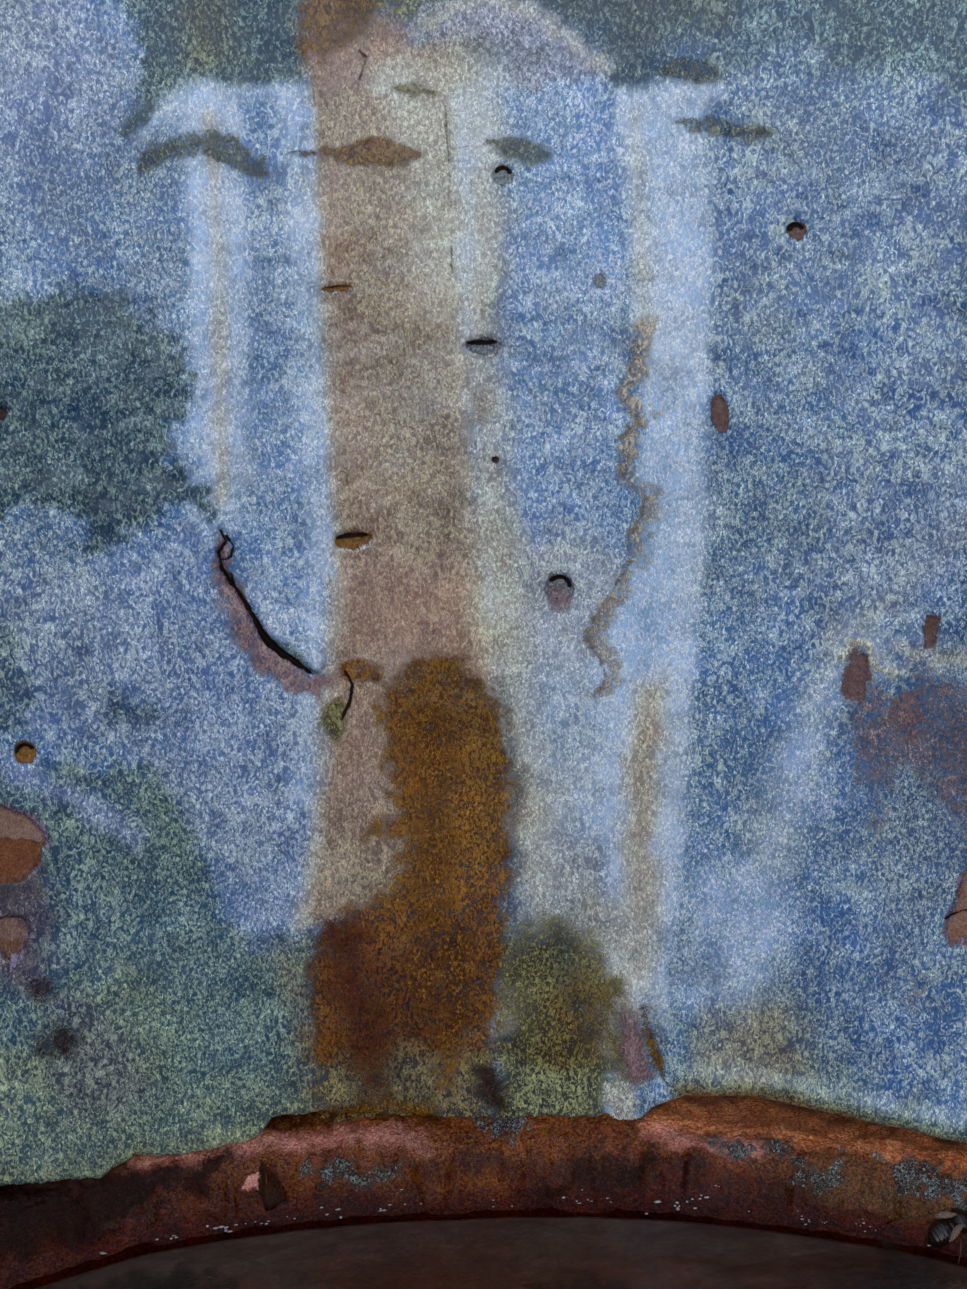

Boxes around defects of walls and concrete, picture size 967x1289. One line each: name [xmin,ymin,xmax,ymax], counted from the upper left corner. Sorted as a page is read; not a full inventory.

corrosion [297,0,397,65]
spalling [711,395,729,432]
crack [210,529,354,720]
spalling [838,636,901,702]
spalling [0,802,50,884]
spalling [0,916,35,974]
corrosion [305,648,521,1122]
spalling [941,870,967,947]